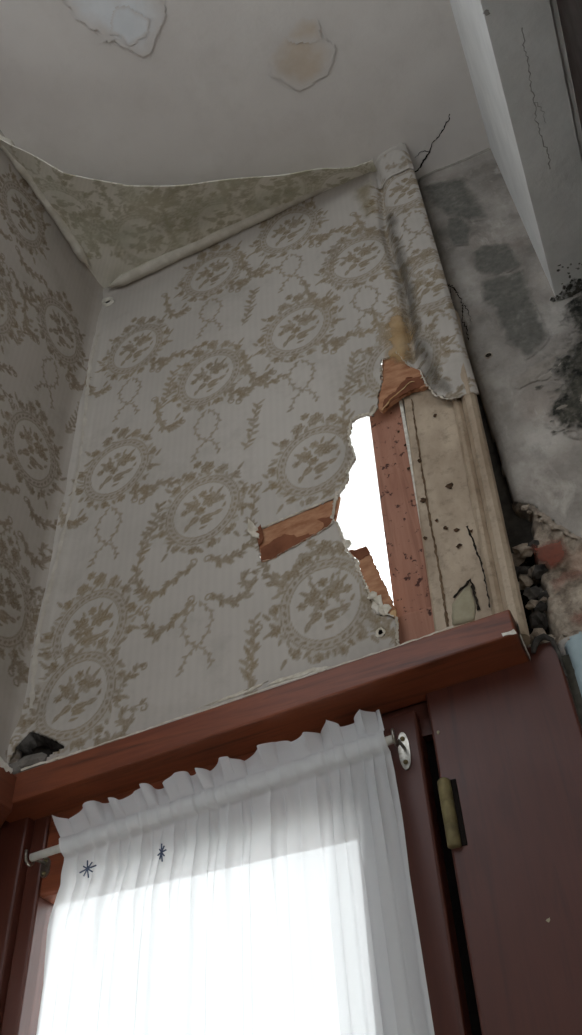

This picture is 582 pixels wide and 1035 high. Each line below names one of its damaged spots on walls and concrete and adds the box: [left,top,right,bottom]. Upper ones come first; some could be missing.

crack [415,114,489,181]
crack [521,27,551,169]
mould [535,263,582,440]
peeling [367,591,392,616]
spalling [397,399,476,627]
flaking render [501,502,582,659]